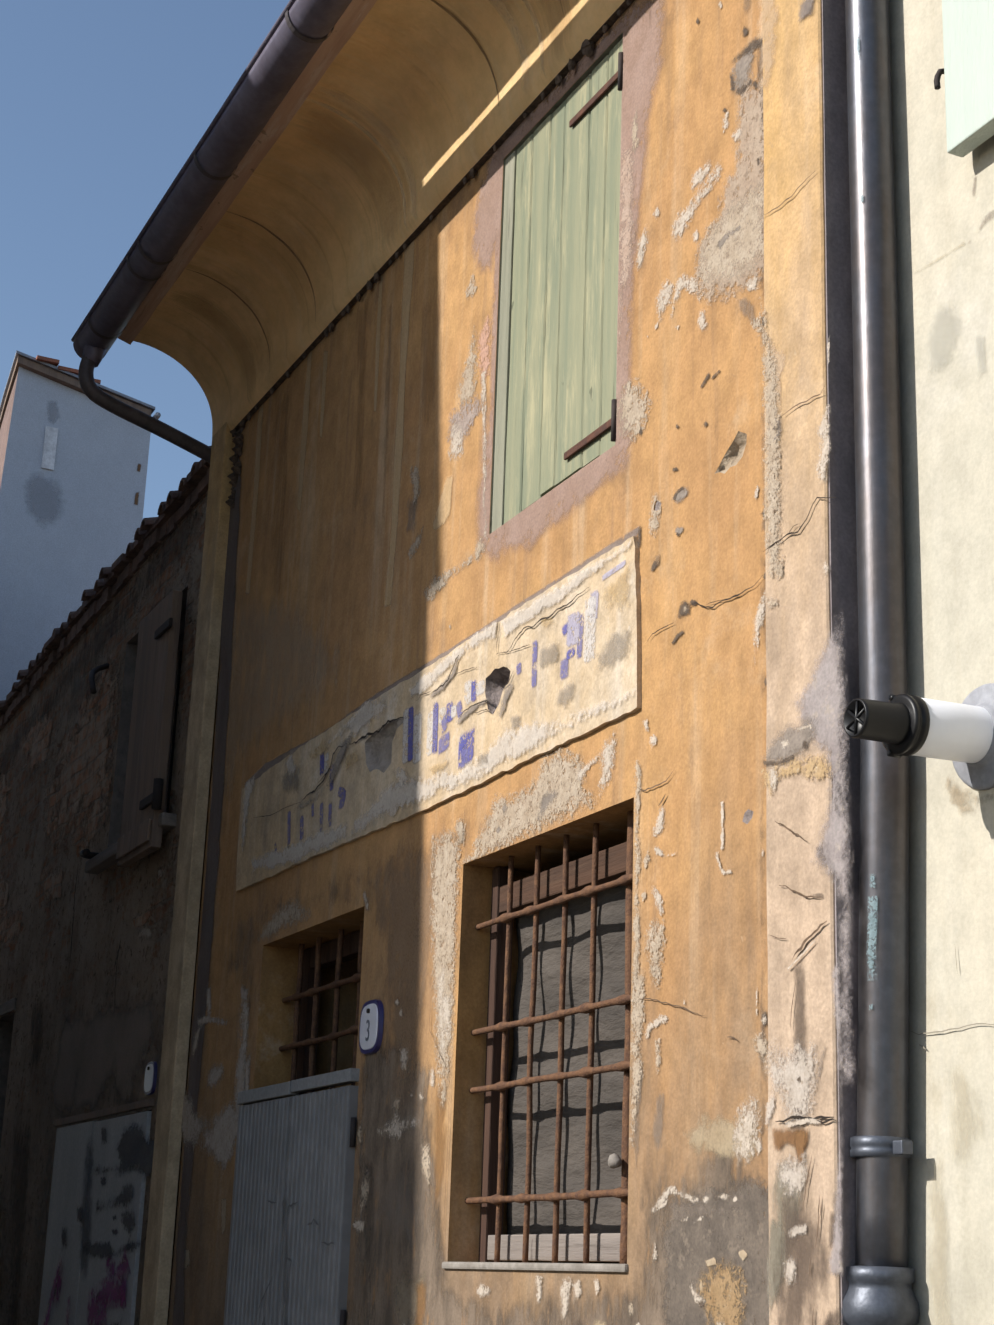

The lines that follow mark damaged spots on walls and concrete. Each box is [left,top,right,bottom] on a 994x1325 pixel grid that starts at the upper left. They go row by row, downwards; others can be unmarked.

peeling [647,0,777,337]
flaking render [424,0,662,601]
spalling [715,431,747,474]
peeling [408,477,688,697]
crack [646,497,836,643]
crack [254,588,587,818]
spalling [761,719,831,795]
peeling [242,666,628,1143]
peeling [421,1144,431,1185]
leakage [349,1046,755,1325]
peeling [732,991,818,1162]
crack [911,1023,994,1050]